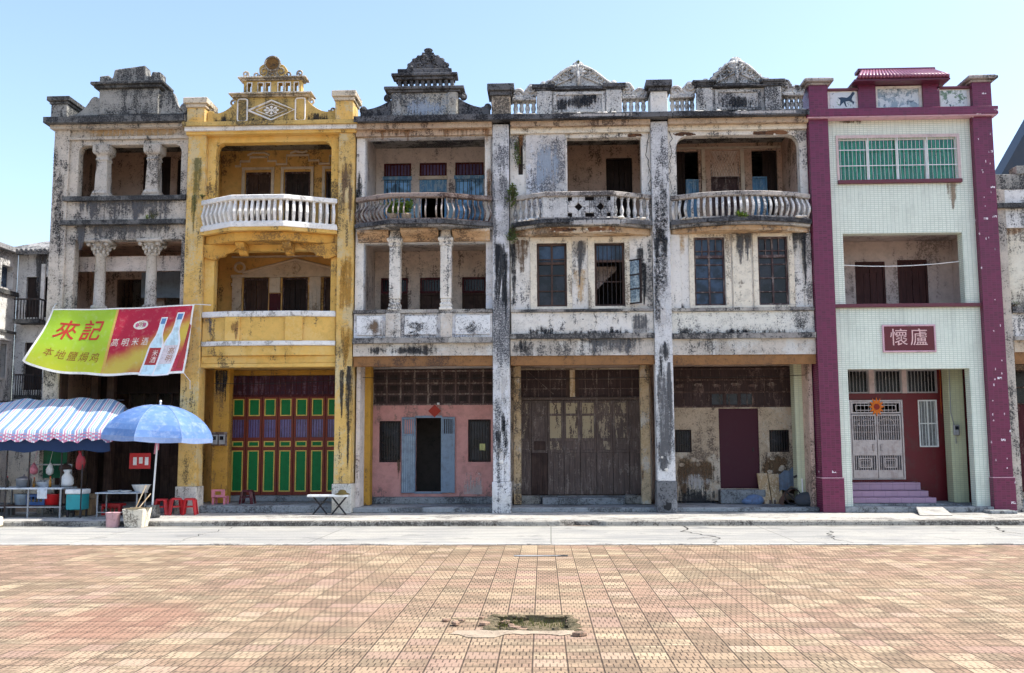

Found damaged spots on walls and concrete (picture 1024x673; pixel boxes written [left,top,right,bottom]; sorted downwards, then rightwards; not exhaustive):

water stain [36,148,65,308]
water stain [494,240,529,319]
water stain [513,178,669,354]
water stain [367,320,437,355]
water stain [340,366,353,465]
water stain [657,342,715,503]
spalling [442,614,587,637]